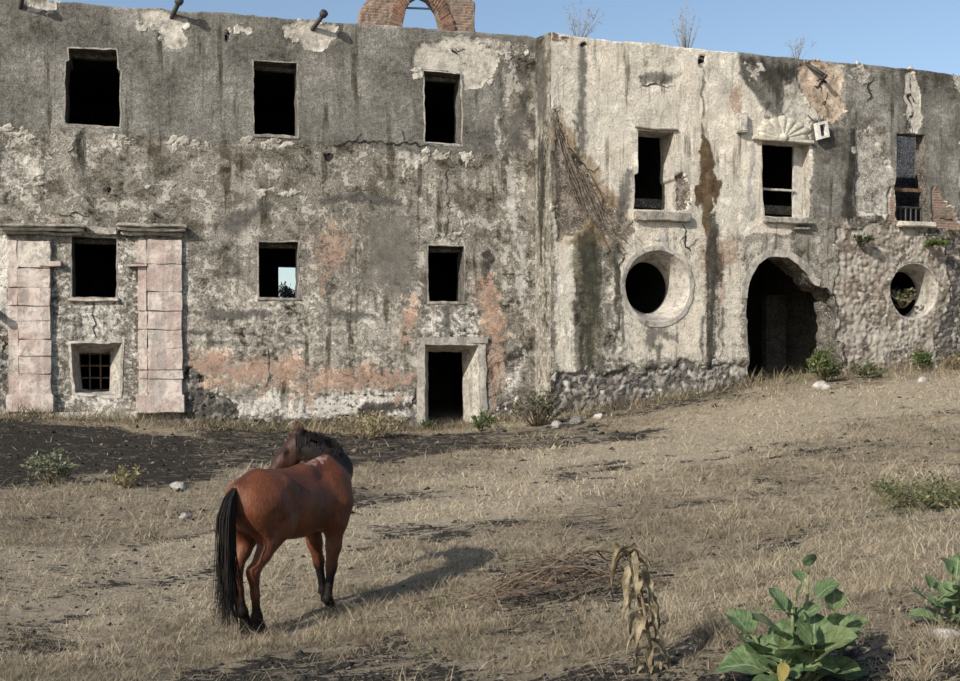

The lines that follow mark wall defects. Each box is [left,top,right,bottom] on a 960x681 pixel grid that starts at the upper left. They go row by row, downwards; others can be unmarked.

peeling [25,0,62,16]
peeling [135,9,190,49]
peeling [282,18,339,52]
peeling [410,34,529,90]
leakage [742,57,801,116]
peeling [781,58,871,124]
peeling [903,65,923,133]
leakage [618,169,632,214]
leakage [577,226,620,369]
leakage [698,212,739,368]